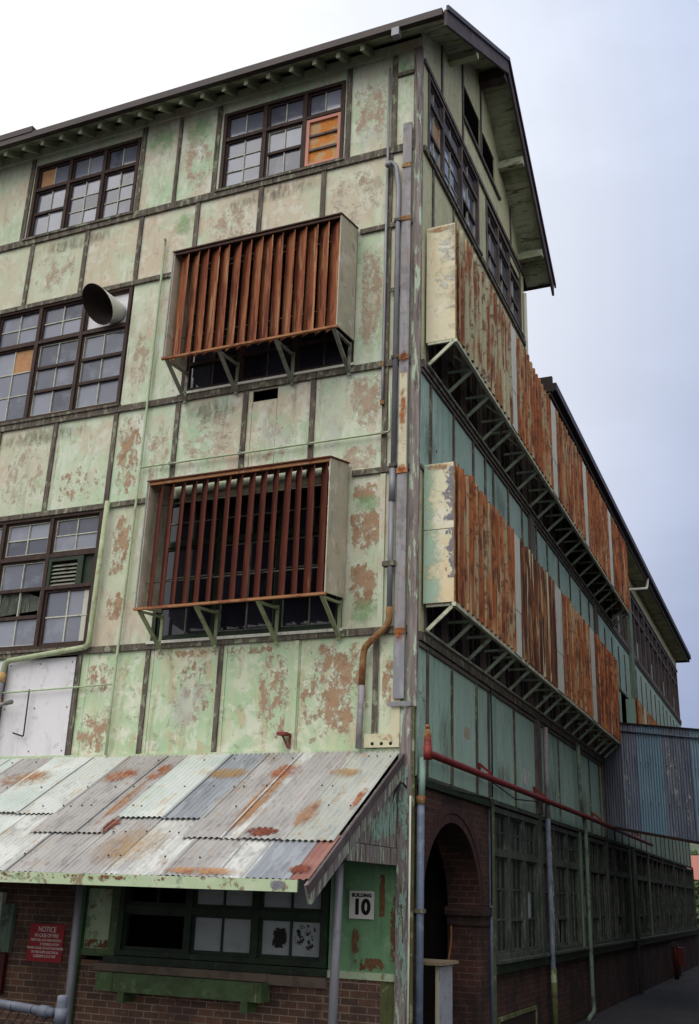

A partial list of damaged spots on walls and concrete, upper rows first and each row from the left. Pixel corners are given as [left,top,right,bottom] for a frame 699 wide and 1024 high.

peeling [115,416,170,495]
peeling [350,482,380,550]
peeling [349,563,378,611]
peeling [156,642,368,744]
peeling [76,714,108,753]
rust [7,772,45,784]
rust [101,764,170,833]
rust [212,769,244,777]
rust [232,765,296,836]
rust [295,802,318,825]
rust [290,864,310,874]
peeling [351,874,407,996]